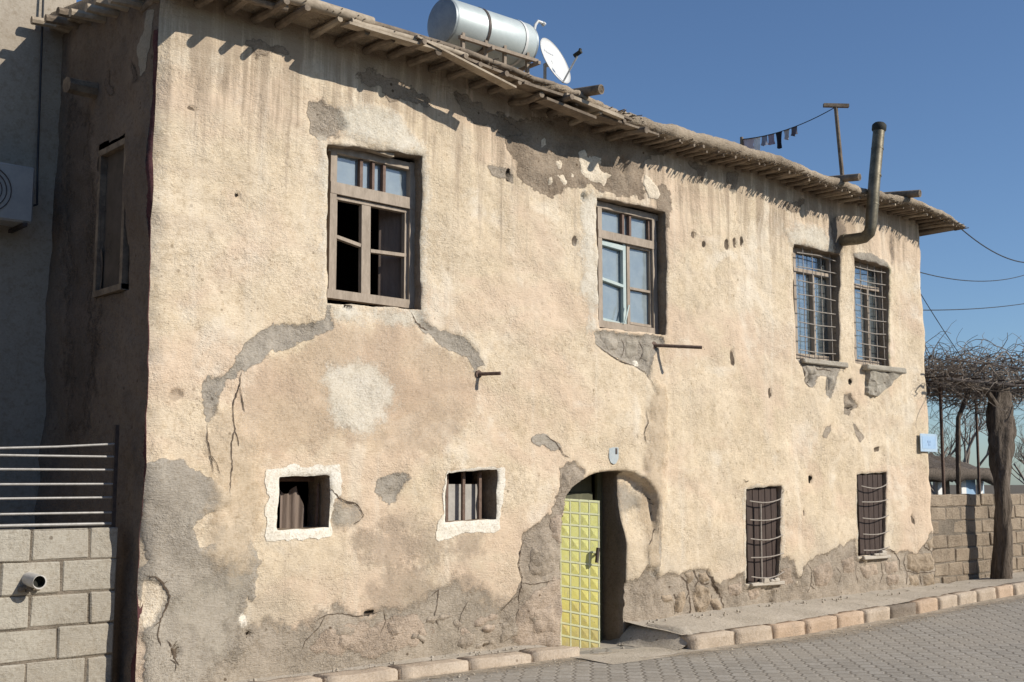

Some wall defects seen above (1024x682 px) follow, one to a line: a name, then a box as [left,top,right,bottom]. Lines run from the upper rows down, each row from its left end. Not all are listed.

spalling [454,91,668,202]
crack [207,373,245,496]
flaking render [594,329,665,378]
flaking render [797,359,864,442]
spalling [140,580,168,627]
flaking render [480,460,586,651]
flaking render [623,500,936,633]